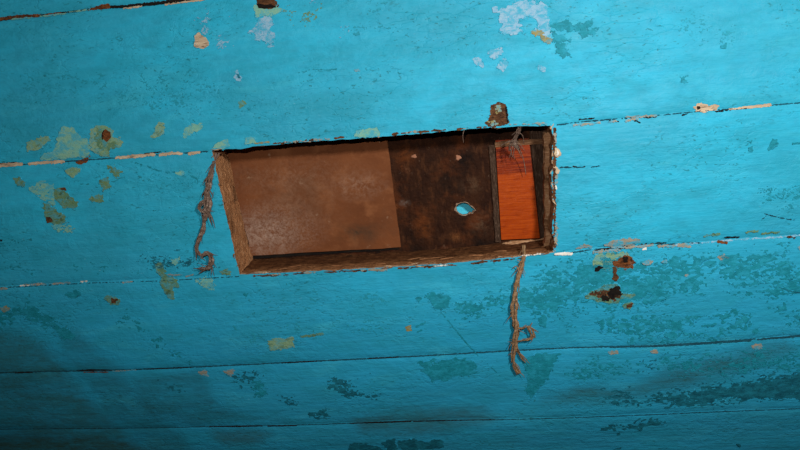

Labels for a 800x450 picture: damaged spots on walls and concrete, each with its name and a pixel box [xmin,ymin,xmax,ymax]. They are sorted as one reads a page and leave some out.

peeling [193,8,229,49]
peeling [472,0,599,72]
peeling [20,65,223,140]
peeling [693,102,719,113]
peeling [13,176,79,233]
peeling [26,125,124,204]
peeling [509,122,561,248]
peeling [90,249,231,300]
peeling [242,290,333,351]
peeling [415,237,800,410]
peeling [601,417,666,436]